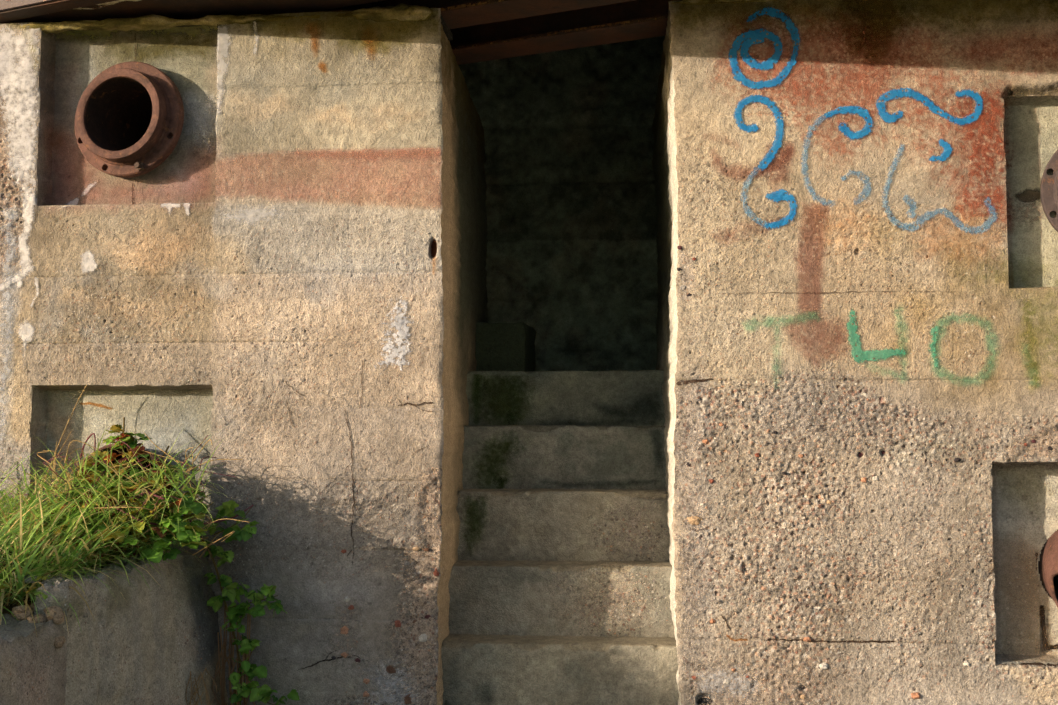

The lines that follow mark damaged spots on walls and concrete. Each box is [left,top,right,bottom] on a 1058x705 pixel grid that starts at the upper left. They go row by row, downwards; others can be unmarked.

water stain [0,23,40,440]
crack [344,360,363,565]
crack [1000,605,1058,667]